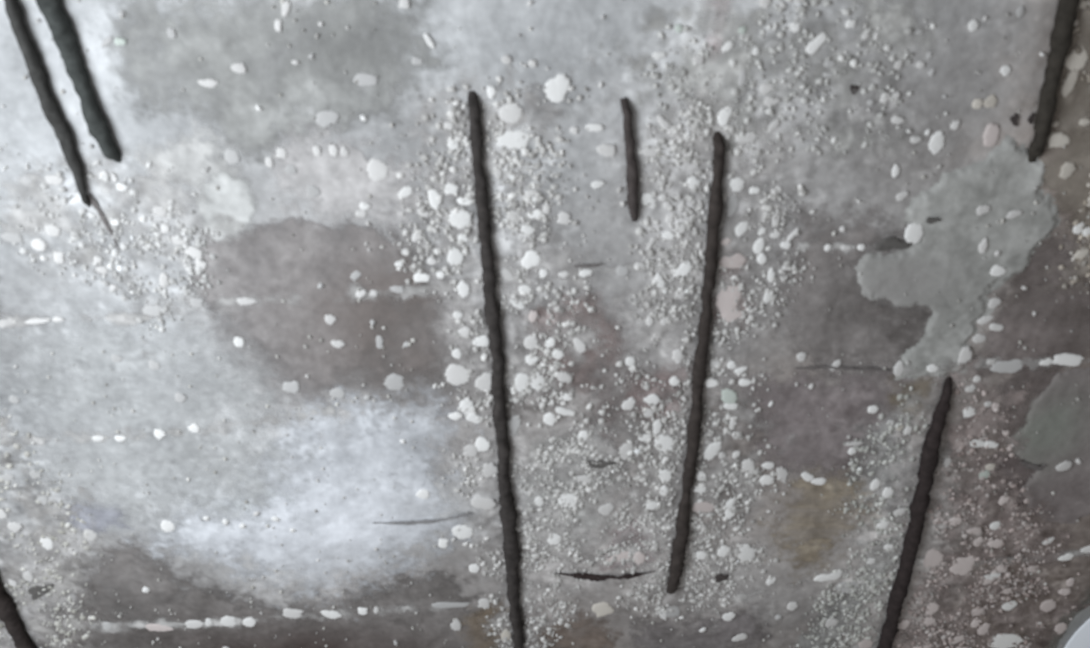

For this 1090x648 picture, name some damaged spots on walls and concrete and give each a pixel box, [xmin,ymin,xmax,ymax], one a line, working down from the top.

crack [554,571,656,582]